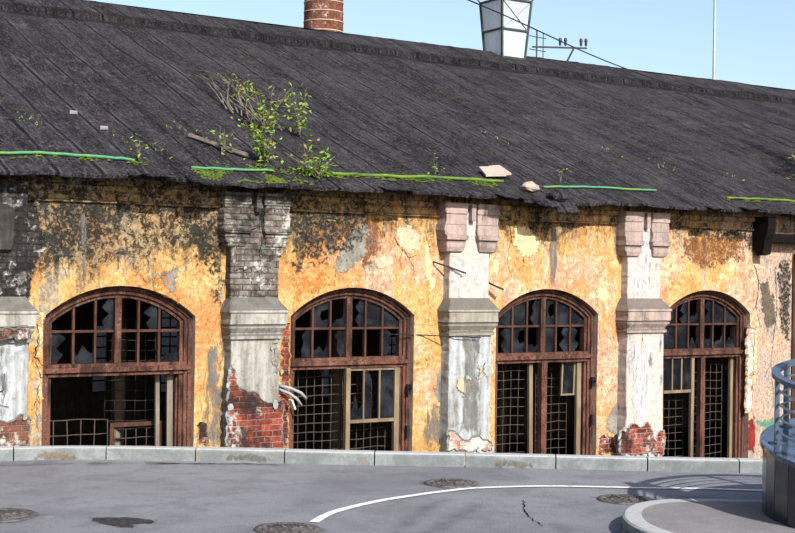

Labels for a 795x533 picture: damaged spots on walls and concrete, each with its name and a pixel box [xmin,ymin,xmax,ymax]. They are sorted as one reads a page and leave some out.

spalling [26,200,48,300]
water stain [33,201,145,287]
water stain [157,206,226,305]
water stain [290,210,369,272]
spalling [0,413,32,447]
spalling [0,302,46,403]
spalling [196,322,292,448]
spalling [598,403,666,457]